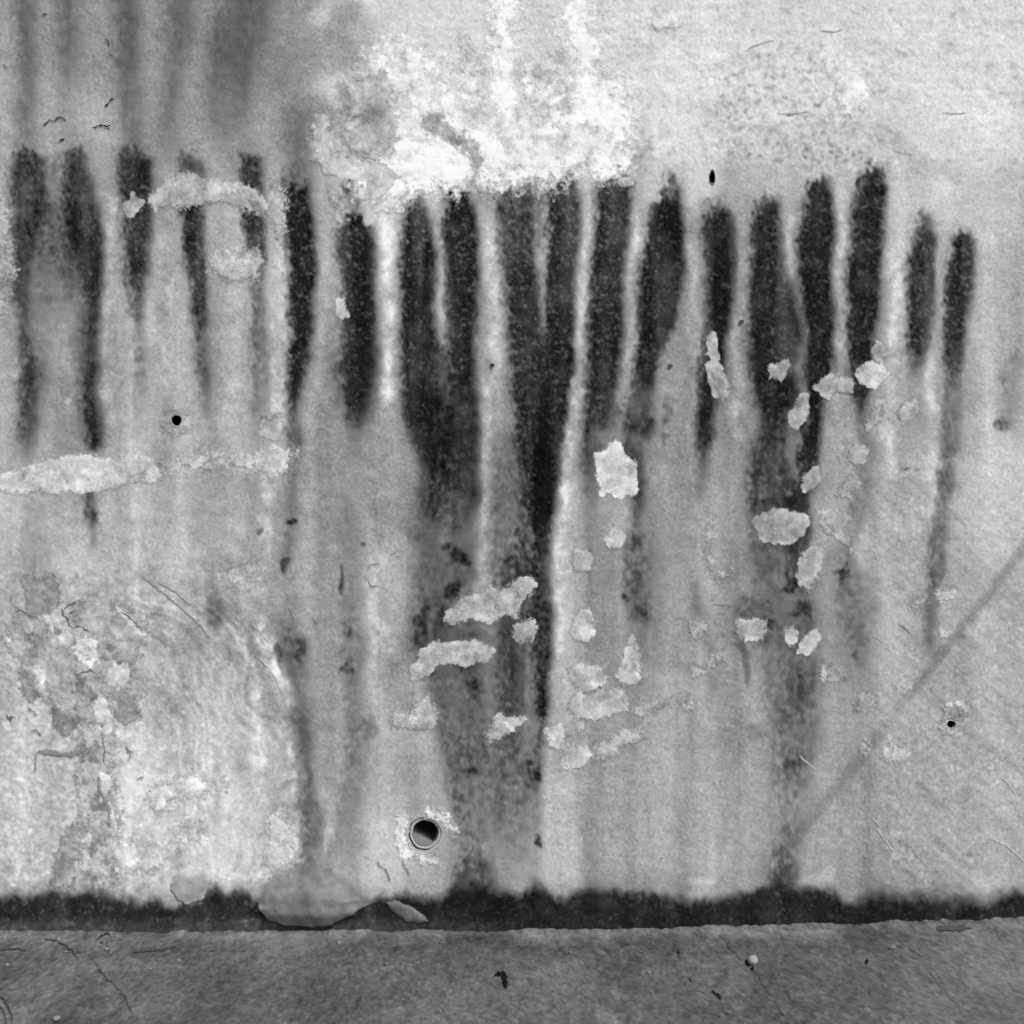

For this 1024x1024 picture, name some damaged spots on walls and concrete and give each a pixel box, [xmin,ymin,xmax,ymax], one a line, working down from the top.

damp [118,148,152,321]
damp [179,204,208,384]
peeling [206,176,266,215]
damp [283,162,317,441]
damp [337,204,376,422]
damp [398,186,480,514]
damp [498,165,632,553]
damp [624,175,686,460]
damp [694,207,736,463]
damp [747,162,888,734]
damp [905,217,974,395]
damp [0,860,1024,933]